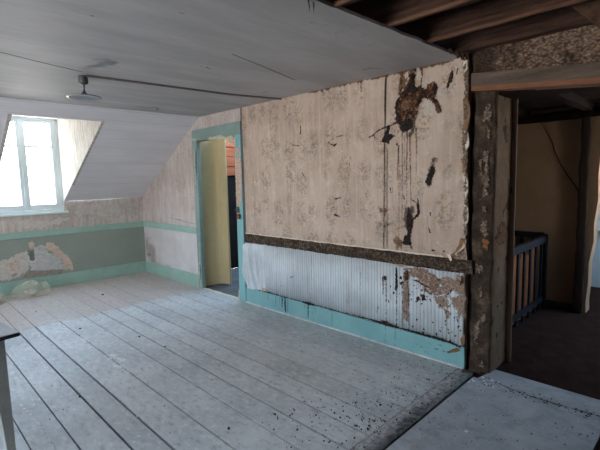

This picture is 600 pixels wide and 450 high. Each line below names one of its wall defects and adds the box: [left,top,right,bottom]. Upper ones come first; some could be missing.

leakage [309,60,453,207]
peeling [0,240,74,282]